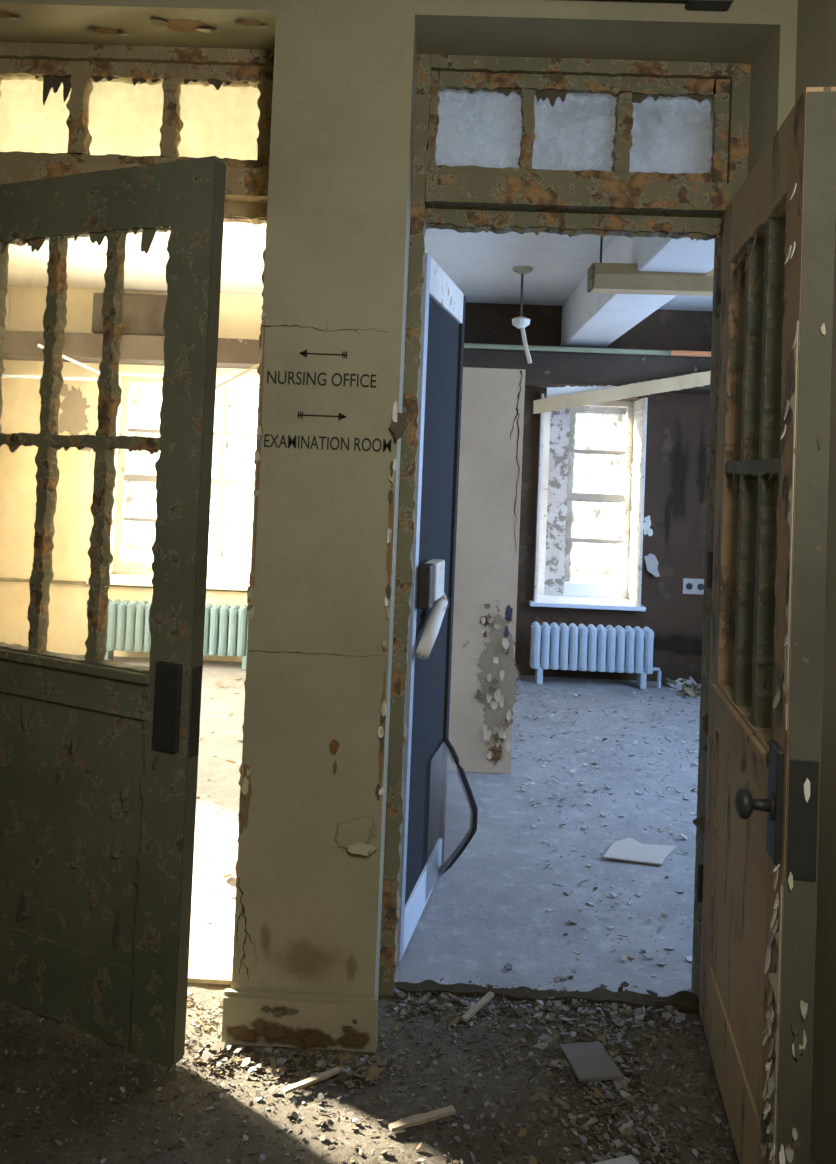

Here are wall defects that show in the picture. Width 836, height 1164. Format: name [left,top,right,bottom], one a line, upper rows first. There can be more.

peeling [28,75,72,105]
peeling [92,77,160,86]
peeling [183,80,247,90]
peeling [390,401,408,440]
water stain [665,440,706,541]
peeling [384,458,396,619]
peeling [475,604,520,760]
peeling [376,671,387,799]
peeling [260,1005,299,1017]